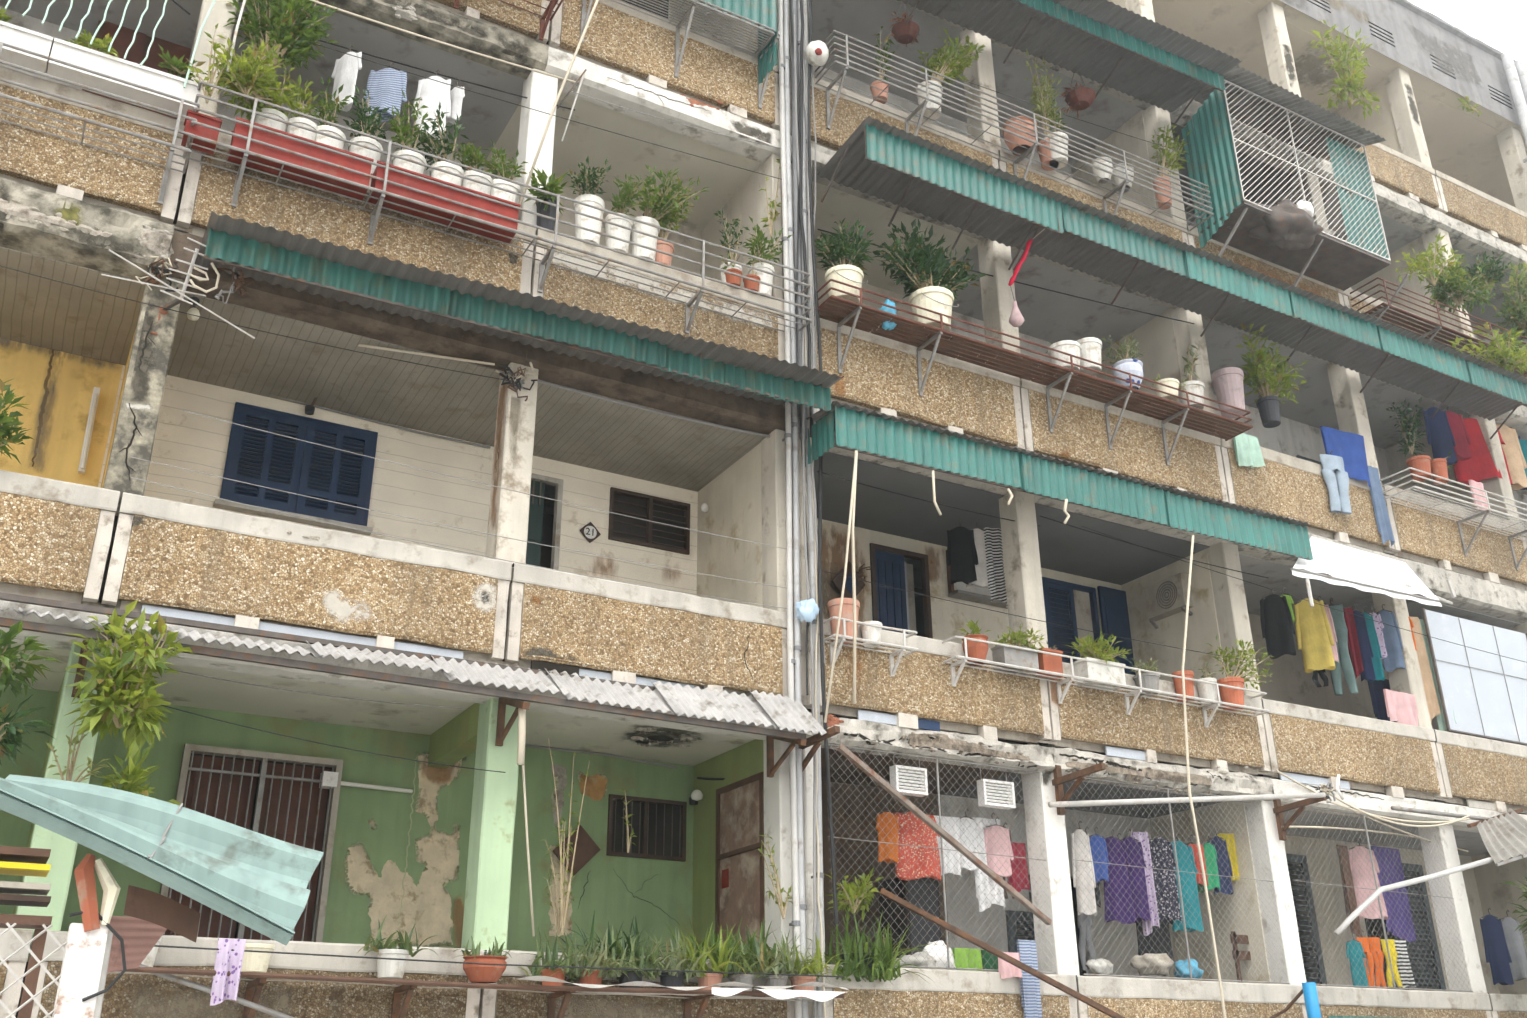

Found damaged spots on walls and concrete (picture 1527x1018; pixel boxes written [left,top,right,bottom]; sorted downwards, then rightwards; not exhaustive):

peeling [344,753,462,947]